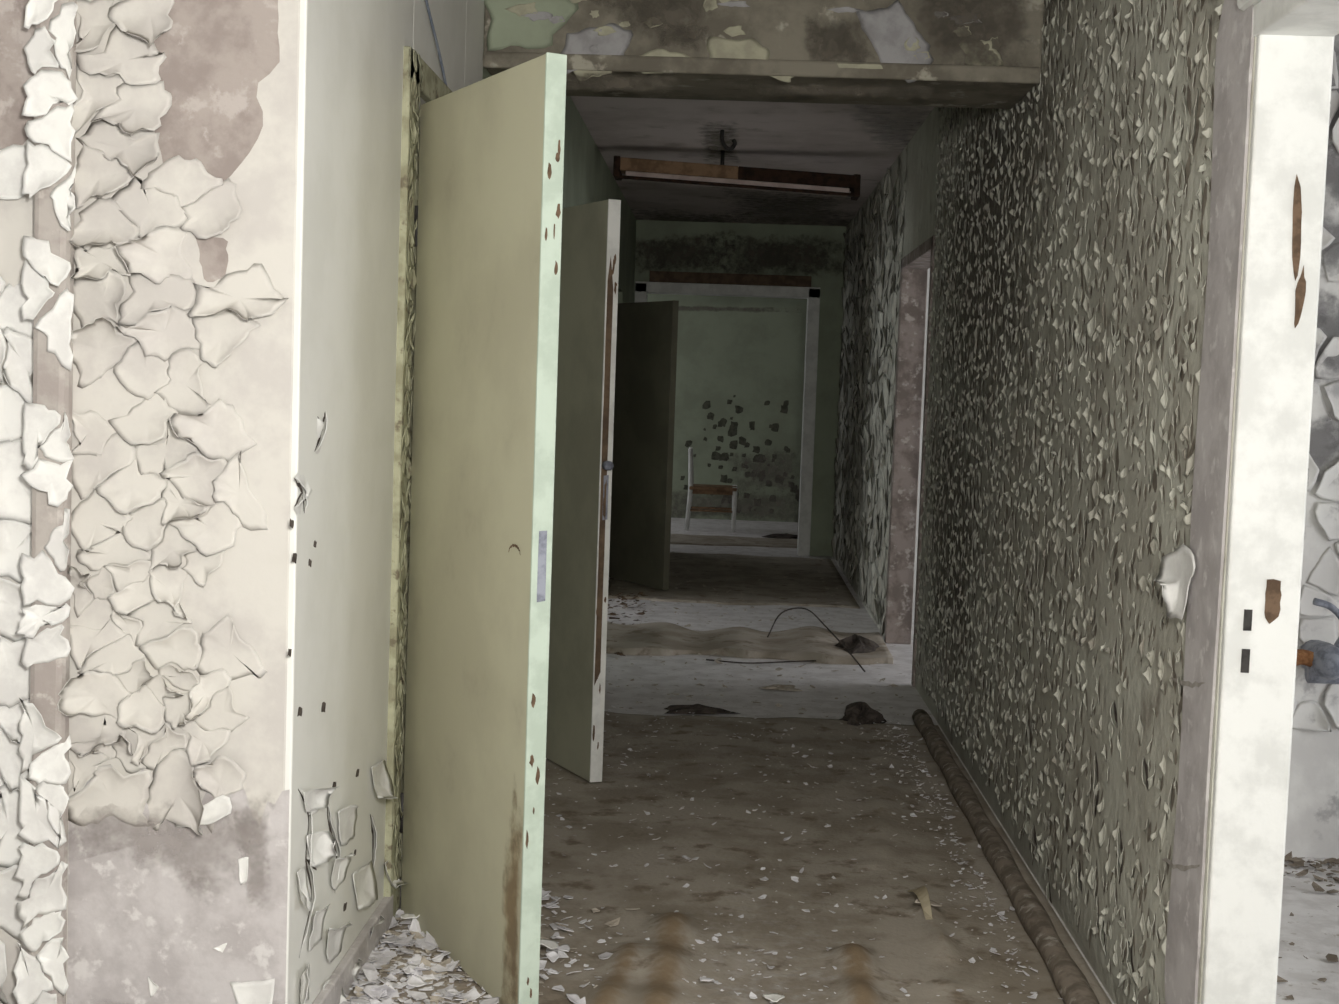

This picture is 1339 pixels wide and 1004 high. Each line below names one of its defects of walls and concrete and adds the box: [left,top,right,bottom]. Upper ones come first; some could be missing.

water stain [566,74,672,92]
water stain [764,85,889,96]
water stain [807,22,865,62]
water stain [922,0,1028,66]
water stain [635,192,842,274]
water stain [945,92,1050,404]
flaking render [0,0,423,1004]
peeling [831,149,907,637]
water stain [931,433,976,656]
flaking render [914,0,1254,1004]